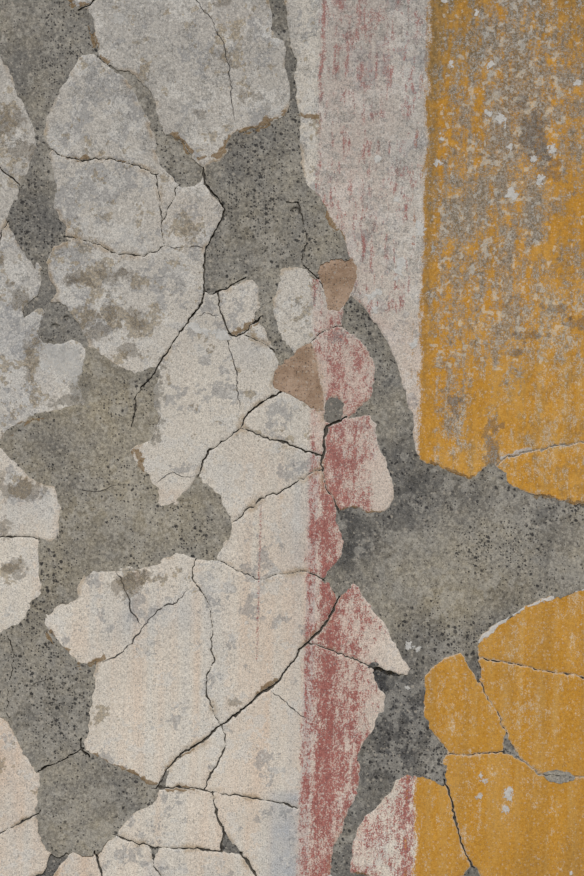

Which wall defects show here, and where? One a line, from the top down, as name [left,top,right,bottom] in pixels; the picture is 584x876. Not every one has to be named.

crack [196,0,234,116]
crack [48,146,346,525]
spalling [0,0,350,876]
crack [498,442,584,465]
spalling [322,297,584,876]
crack [38,738,90,772]
crack [104,558,371,876]
crack [447,658,584,778]
crack [0,810,41,834]
crack [94,850,103,876]
crack [443,779,472,867]